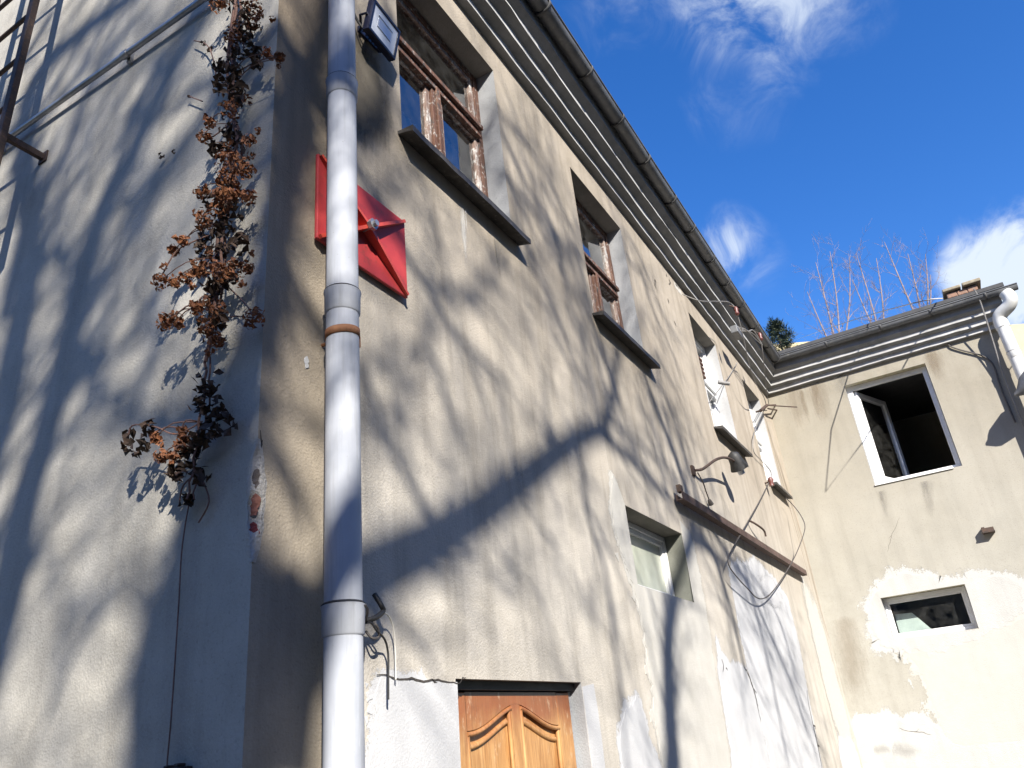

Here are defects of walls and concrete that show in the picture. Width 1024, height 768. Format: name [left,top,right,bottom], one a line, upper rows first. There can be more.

spalling [245,438,267,563]